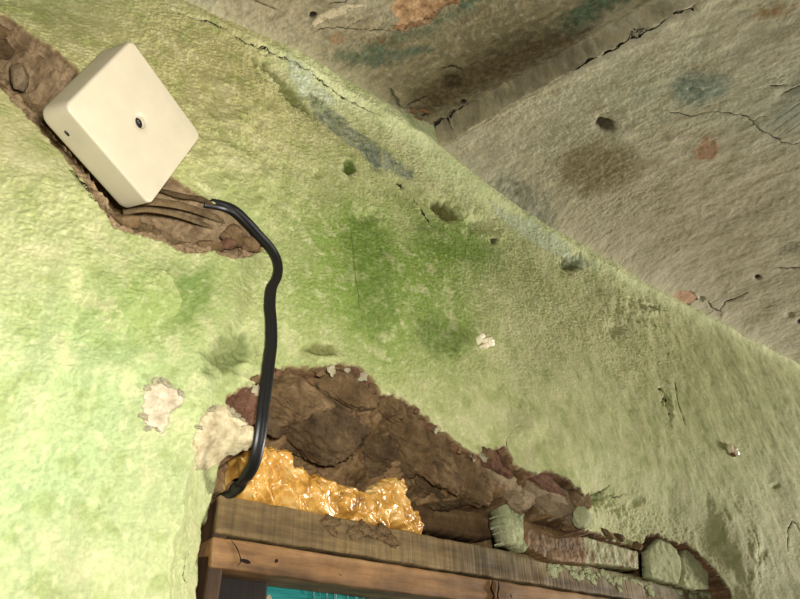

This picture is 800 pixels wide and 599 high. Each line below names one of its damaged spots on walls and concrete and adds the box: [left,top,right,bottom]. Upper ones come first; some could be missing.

peeling [391,0,459,32]
crack [566,3,697,75]
spalling [0,16,261,259]
crack [390,88,471,130]
crack [662,110,798,145]
peeling [138,377,185,433]
peeling [192,374,261,500]
spalling [265,364,731,599]